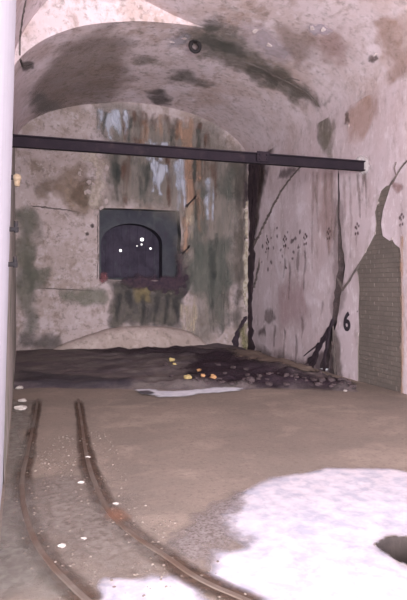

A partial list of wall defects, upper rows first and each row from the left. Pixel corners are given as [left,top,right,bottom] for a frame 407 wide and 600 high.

damp [151,89,168,104]
damp [101,108,224,150]
damp [173,72,196,81]
damp [185,22,309,101]
damp [16,210,60,349]
damp [61,282,183,328]
damp [111,154,265,337]
corrosion [184,160,201,251]
crack [232,164,301,350]
crack [304,171,360,375]
flaking render [357,185,402,393]